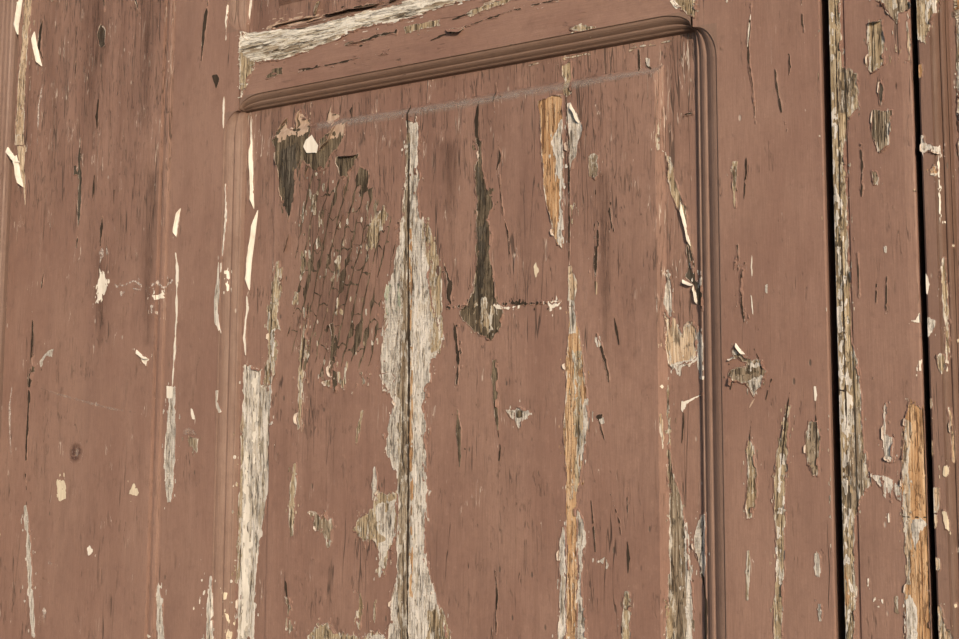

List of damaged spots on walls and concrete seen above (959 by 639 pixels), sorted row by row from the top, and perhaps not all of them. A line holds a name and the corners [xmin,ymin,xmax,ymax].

peeling [265,0,394,30]
peeling [6,0,44,205]
peeling [911,23,959,178]
peeling [155,252,201,509]
crack [266,160,399,433]
peeling [352,490,399,580]
peeling [658,310,704,380]
peeling [680,198,704,312]
peeling [680,392,704,443]
peeling [743,429,759,520]
peeling [770,386,824,639]
peeling [284,581,395,639]